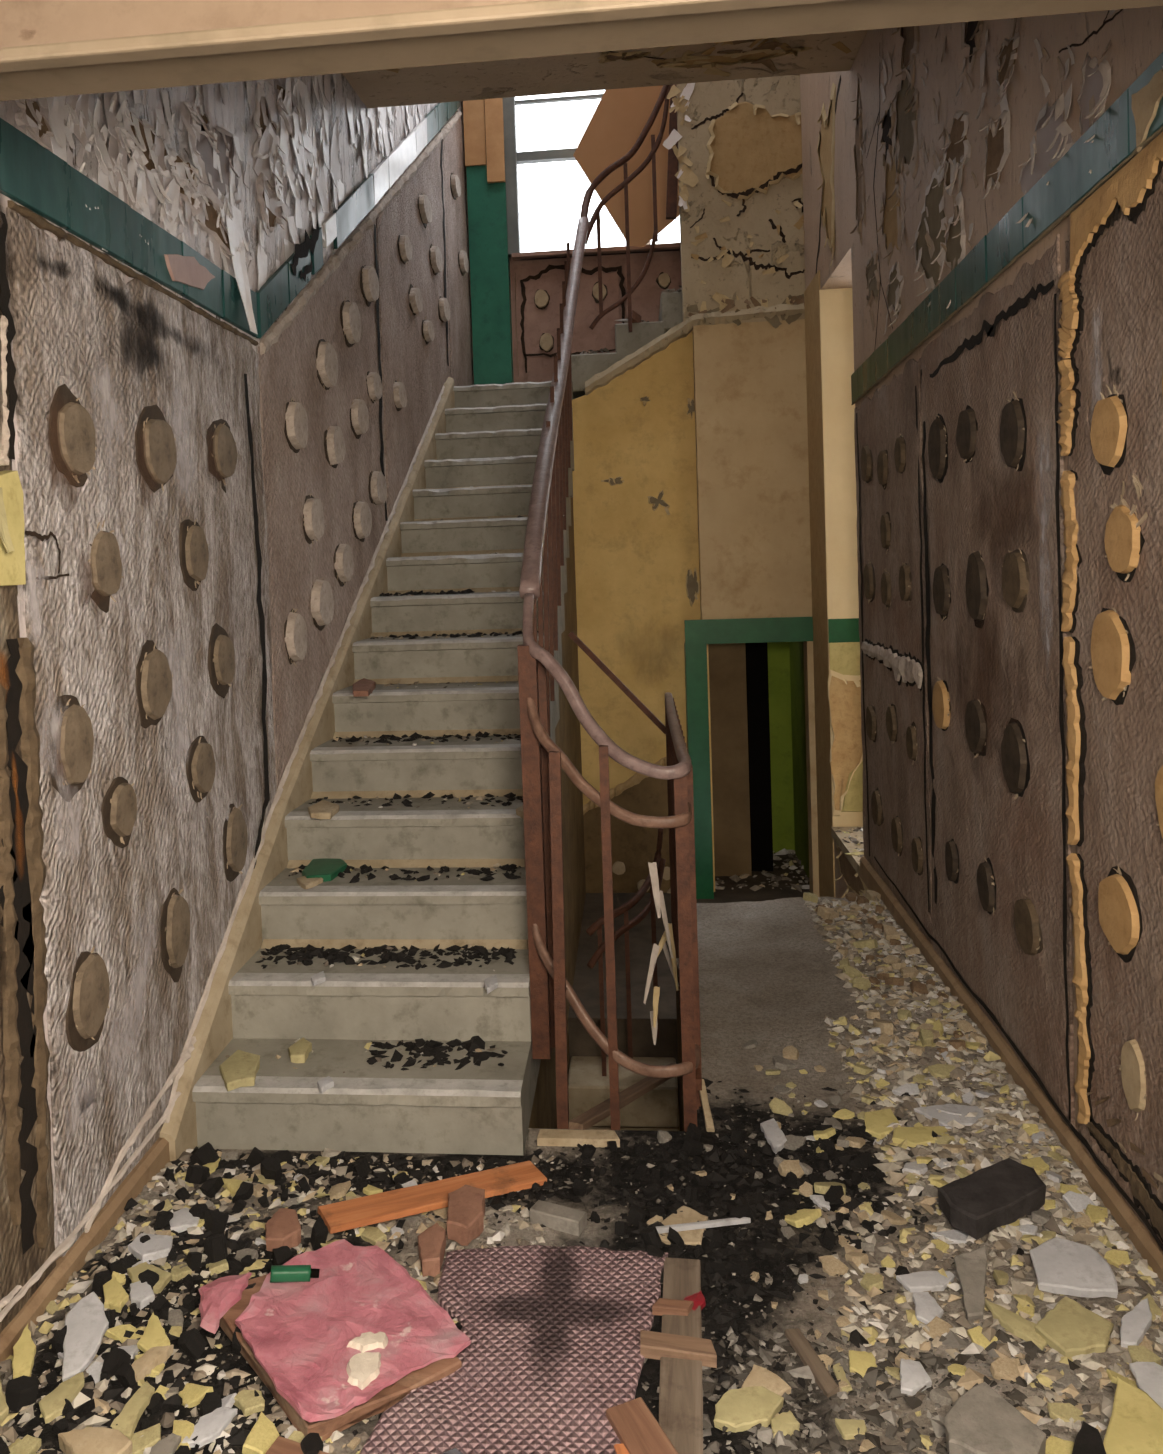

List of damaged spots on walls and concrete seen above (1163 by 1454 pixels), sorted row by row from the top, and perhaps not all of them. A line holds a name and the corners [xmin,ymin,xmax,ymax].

peeling [15,74,422,291]
flaking render [597,18,1111,335]
crack [856,280,1163,1251]